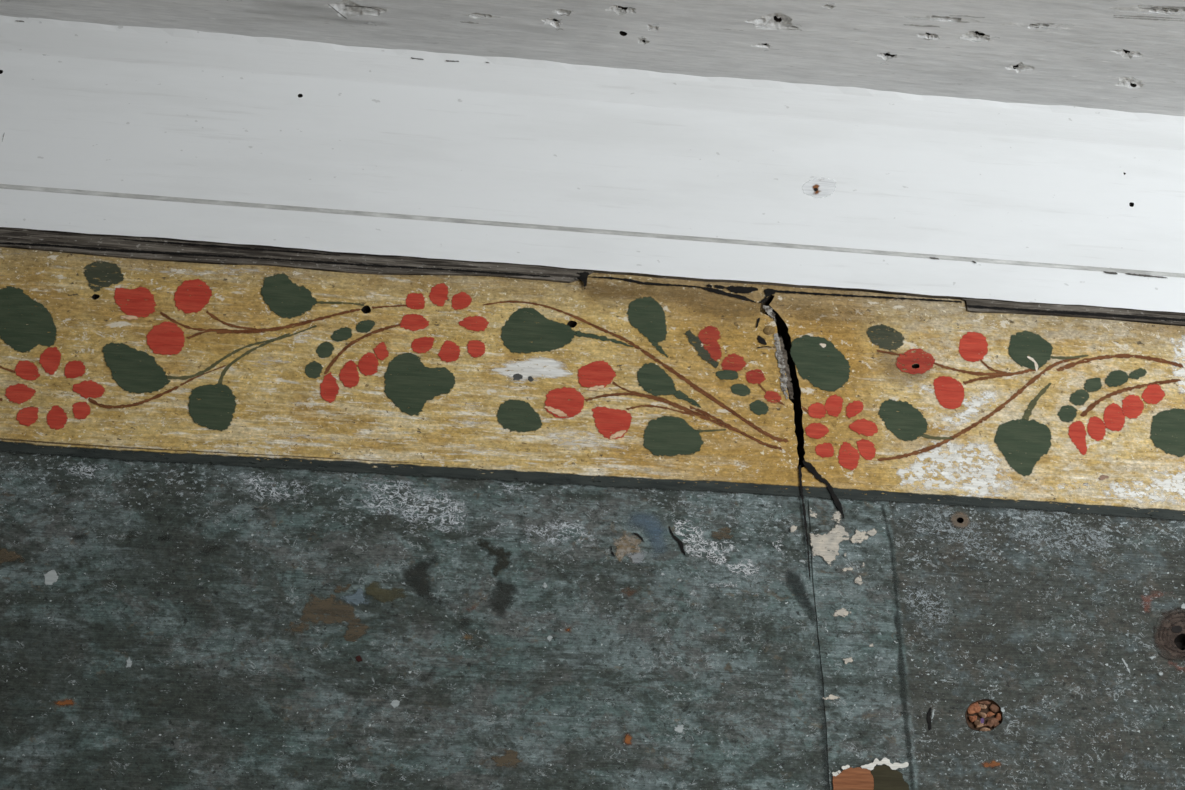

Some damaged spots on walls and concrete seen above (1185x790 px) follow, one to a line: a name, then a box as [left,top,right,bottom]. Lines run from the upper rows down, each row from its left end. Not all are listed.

crack [0,239,1185,577]
peeling [669,520,758,587]
peeling [788,511,877,616]
crack [882,504,935,790]
peeling [818,656,910,790]